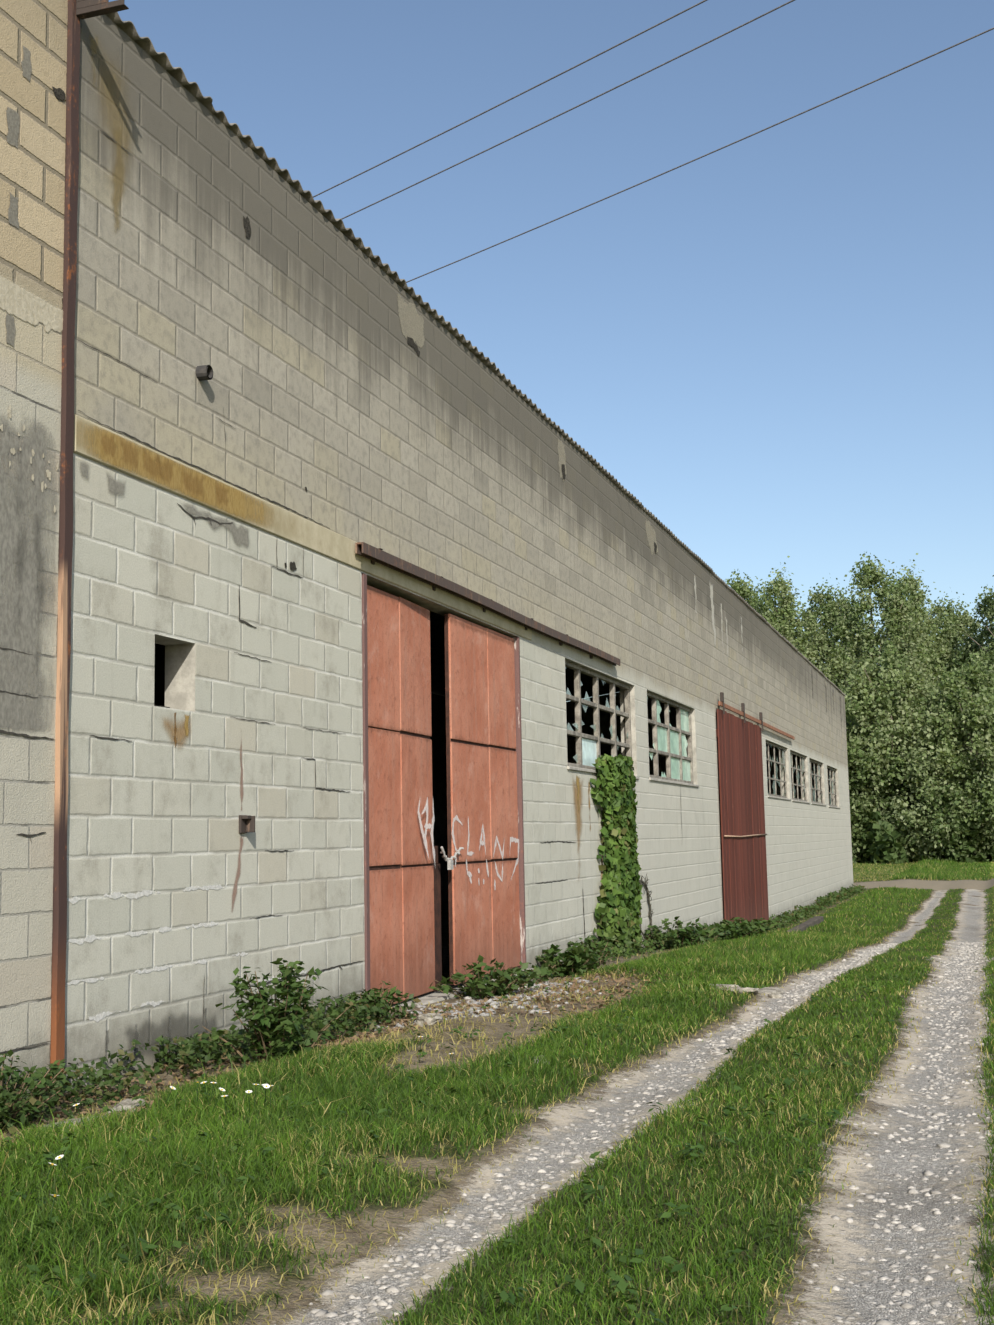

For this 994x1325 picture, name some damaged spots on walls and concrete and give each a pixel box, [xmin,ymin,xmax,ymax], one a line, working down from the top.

peeling [0,276,63,332]
spalling [397,293,425,356]
corrosion [84,426,267,524]
spalling [186,505,249,547]
water stain [0,420,55,731]
corrosion [164,713,189,747]
corrosion [574,776,591,840]
corrosion [232,838,243,909]